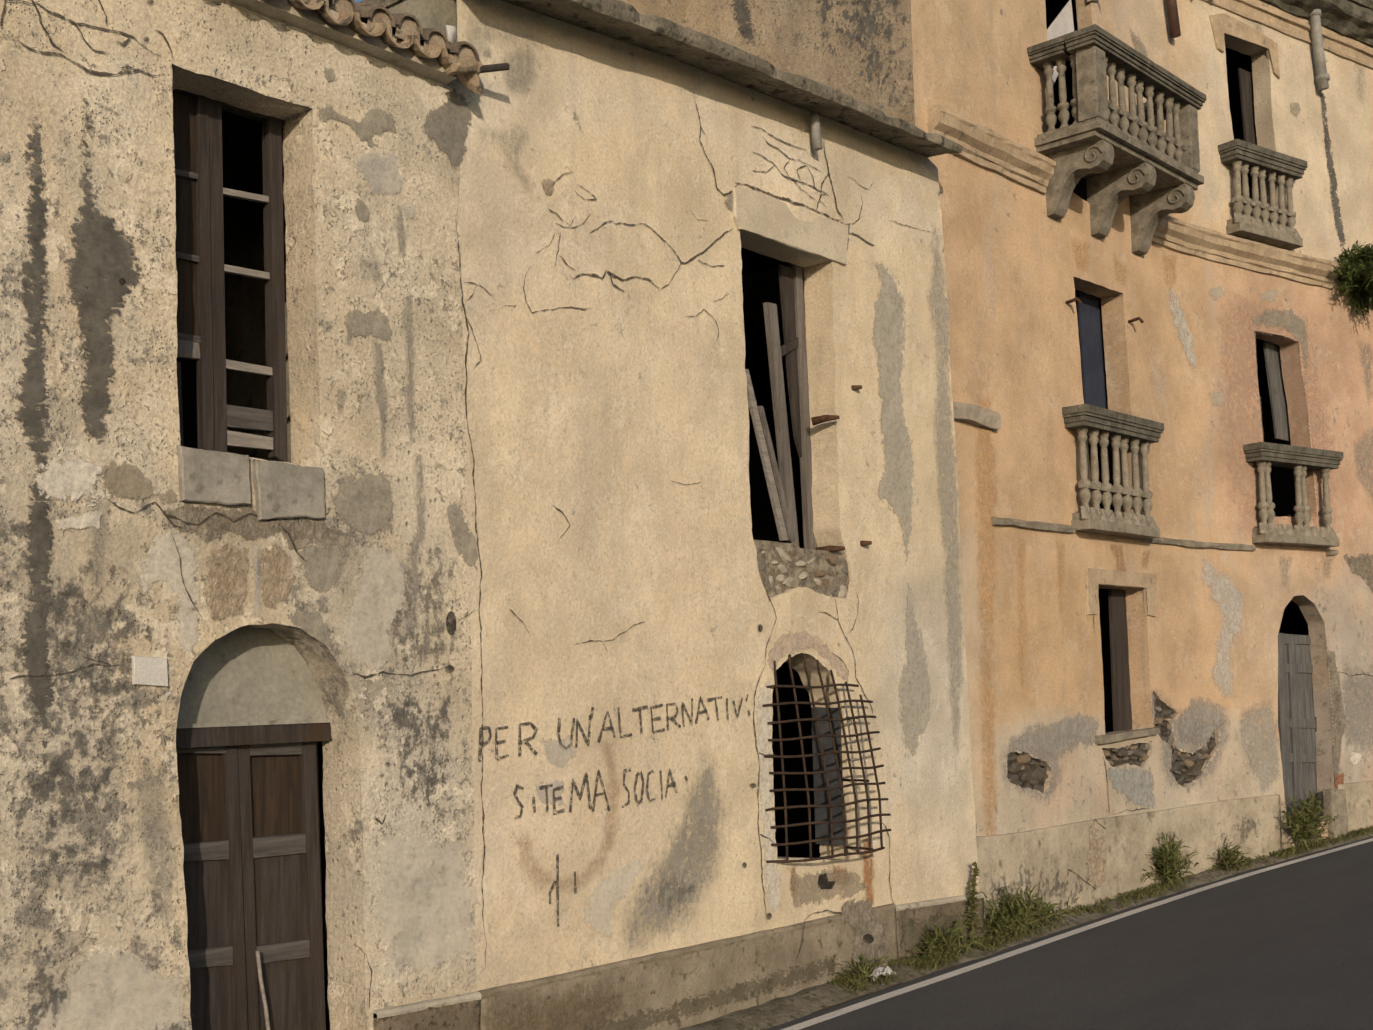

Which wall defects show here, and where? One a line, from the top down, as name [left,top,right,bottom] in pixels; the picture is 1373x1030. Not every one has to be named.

crack [0,0,173,76]
damp [730,0,755,46]
damp [1319,91,1345,250]
damp [0,99,160,890]
crack [104,497,306,617]
crack [456,92,932,963]
spalling [753,540,850,598]
peeling [1108,765,1155,809]
damp [583,770,720,941]
damp [24,941,68,1030]